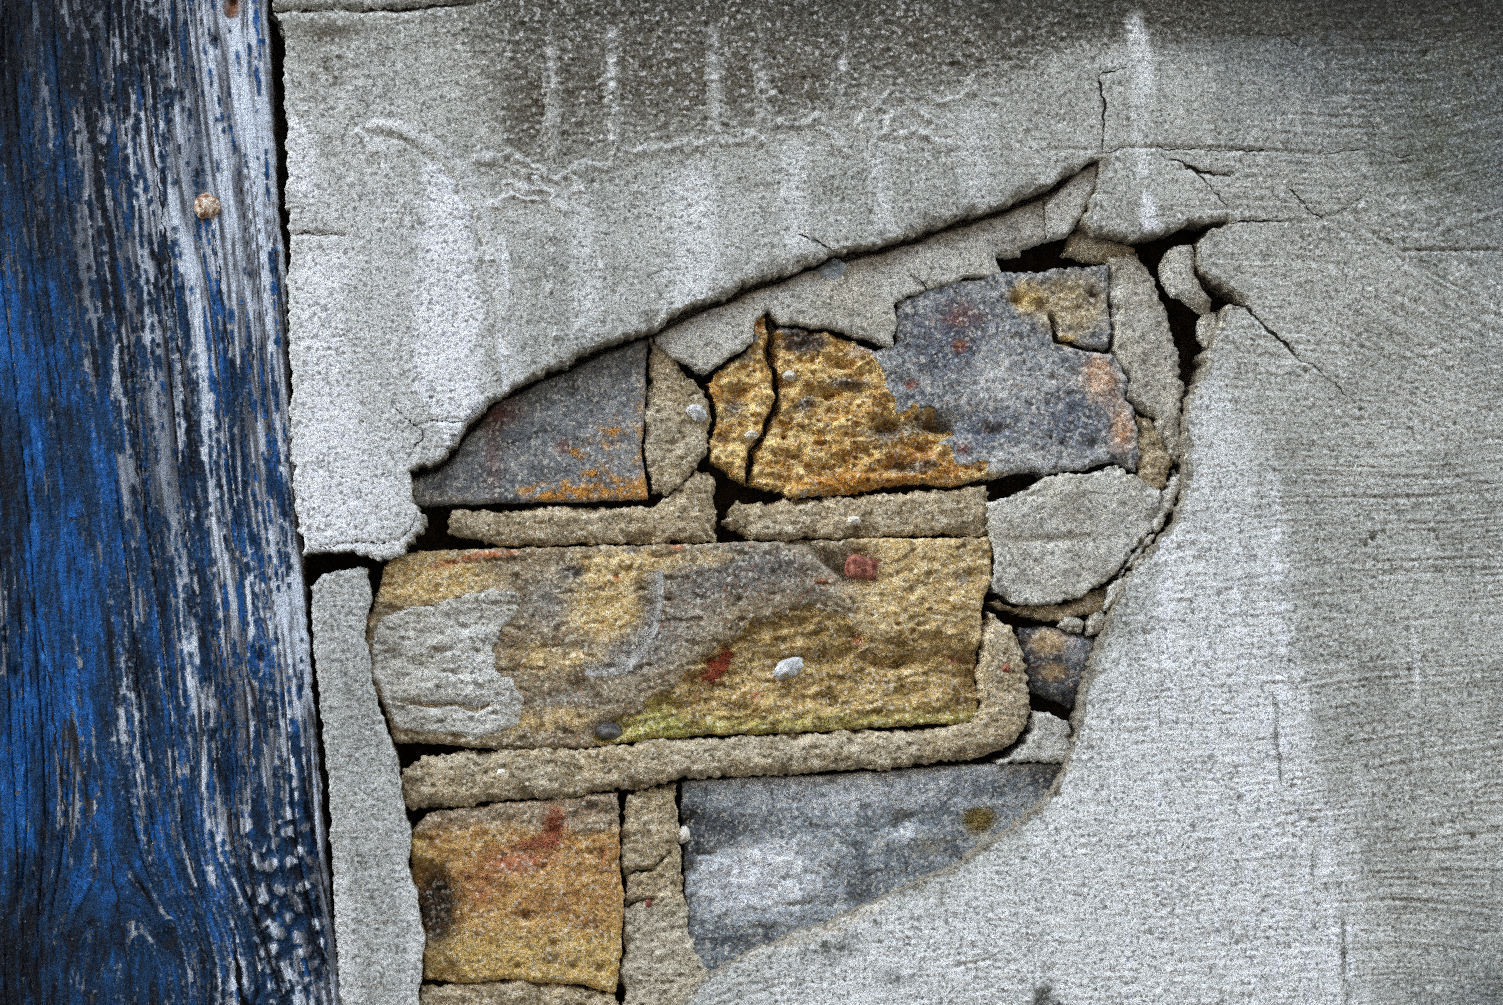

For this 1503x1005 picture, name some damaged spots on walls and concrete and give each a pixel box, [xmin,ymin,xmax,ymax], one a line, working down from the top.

crack [1098,67,1413,224]
crack [1229,294,1354,401]
spalling [398,151,1251,1005]